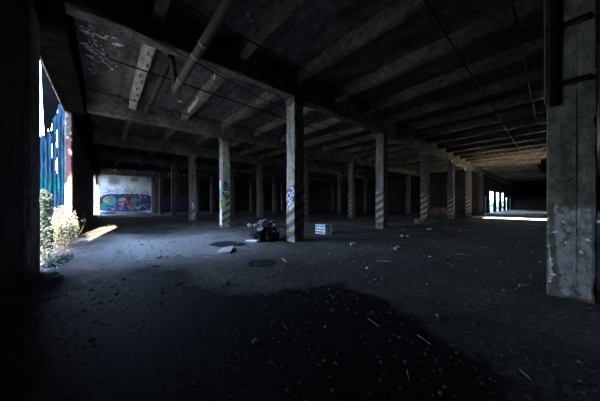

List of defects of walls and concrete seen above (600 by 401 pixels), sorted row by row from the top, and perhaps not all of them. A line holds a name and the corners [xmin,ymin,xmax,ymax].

peeling [79,25,123,70]
peeling [548,204,593,300]